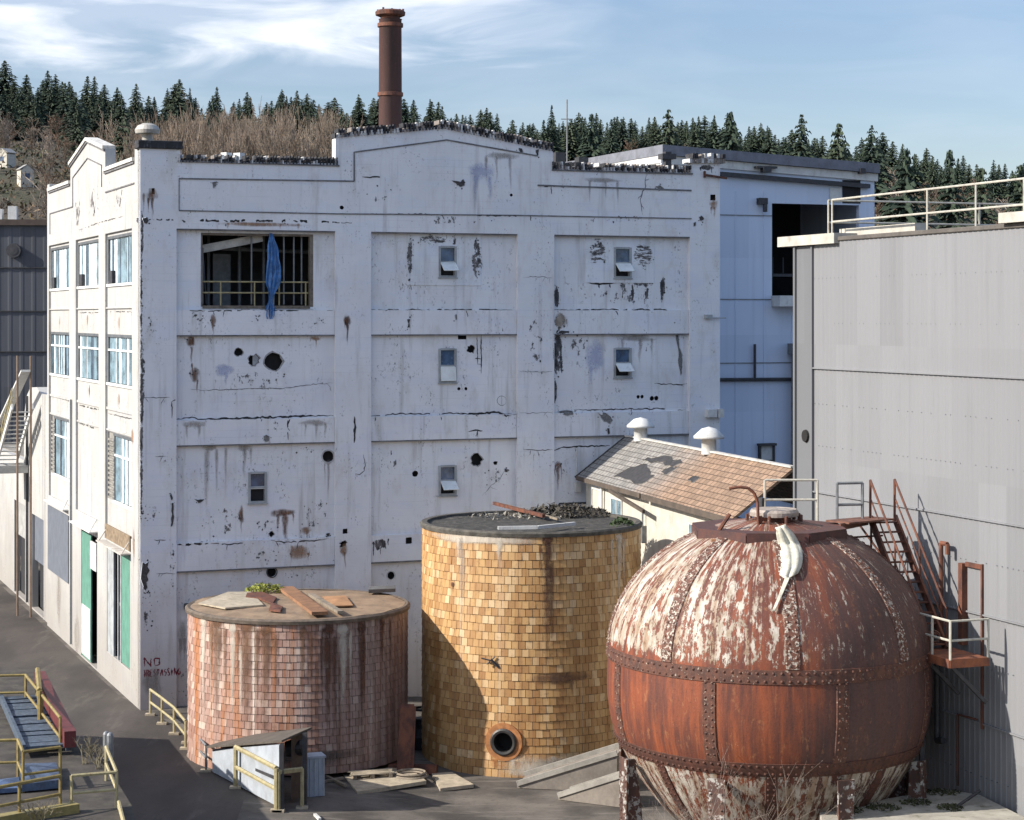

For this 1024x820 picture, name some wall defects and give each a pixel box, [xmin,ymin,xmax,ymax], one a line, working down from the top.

peeling [472,237,482,278]
peeling [586,239,606,263]
peeling [634,245,655,270]
spalling [234,347,285,388]
crack [68,383,683,475]
corrosion [273,510,294,534]
corrosion [291,546,310,557]
leakage [201,619,212,689]
efflorescence [229,623,242,699]
efflorescence [337,625,352,700]